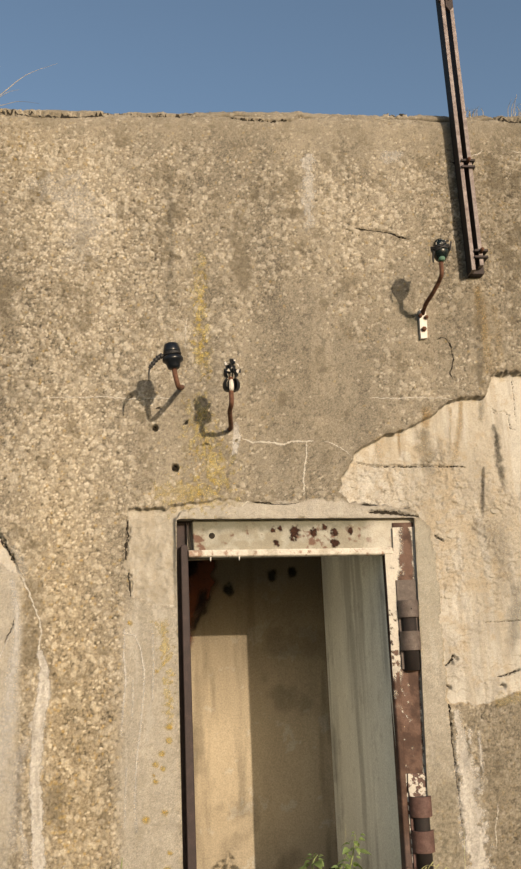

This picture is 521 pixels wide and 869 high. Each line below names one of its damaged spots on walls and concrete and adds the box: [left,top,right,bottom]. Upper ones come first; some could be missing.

crack [356,228,406,239]
crack [242,438,463,505]
crack [0,536,42,653]
crack [123,520,131,596]
corrosion [188,560,216,644]
spalling [340,373,521,707]
leakage [20,651,50,869]
peeling [406,737,427,861]
leakage [454,710,493,869]